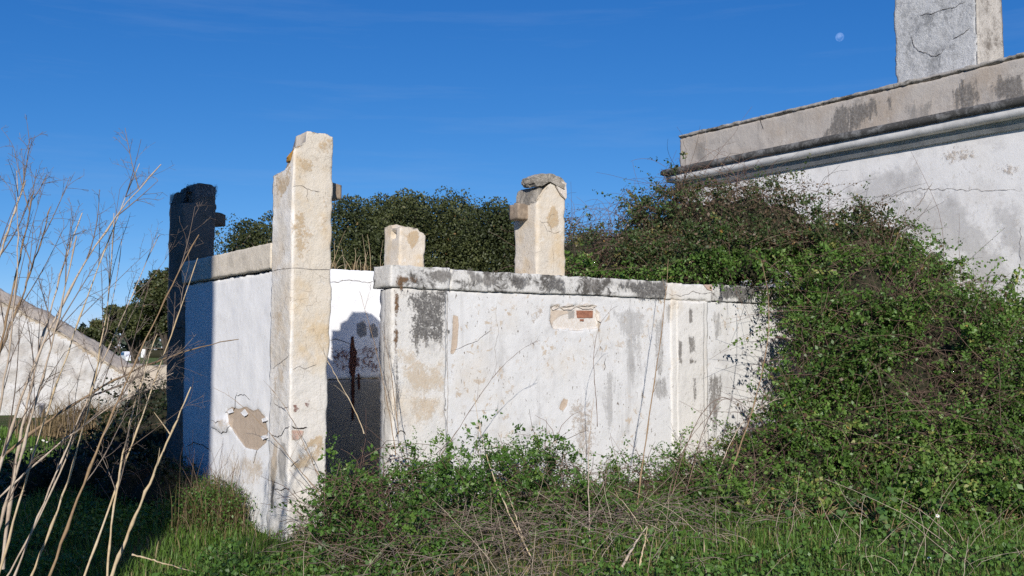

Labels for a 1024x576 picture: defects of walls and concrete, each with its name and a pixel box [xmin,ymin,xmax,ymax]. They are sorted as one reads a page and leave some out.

damp [952,80,979,108]
damp [994,75,1024,98]
damp [823,98,891,137]
damp [510,274,526,290]
damp [546,277,566,294]
damp [619,279,667,300]
damp [400,270,452,353]
spalling [532,303,601,331]
damp [679,337,696,364]
corrosion [349,336,360,420]
damp [693,377,722,421]
spalling [227,407,268,450]